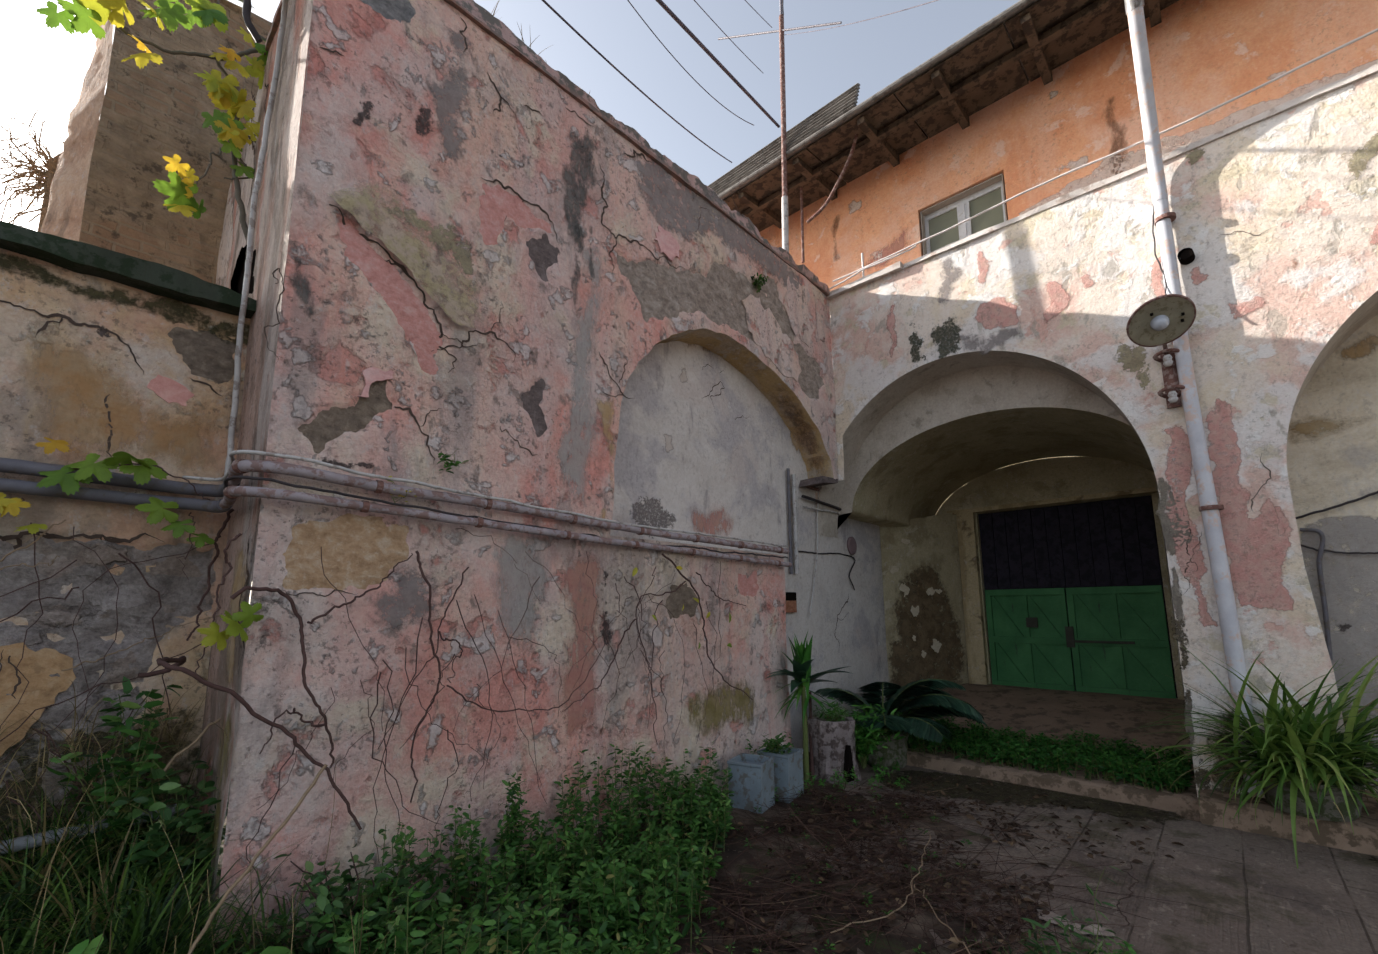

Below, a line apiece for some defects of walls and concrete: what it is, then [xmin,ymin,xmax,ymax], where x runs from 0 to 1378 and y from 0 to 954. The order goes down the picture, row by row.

flaking render [361,0,416,23]
crack [459,17,685,271]
crack [0,300,144,375]
flaking render [617,226,825,399]
flaking render [298,367,395,454]
crack [0,531,164,550]
crack [238,536,250,674]
crack [283,589,356,597]
peeling [1156,399,1294,792]
crack [0,649,21,699]